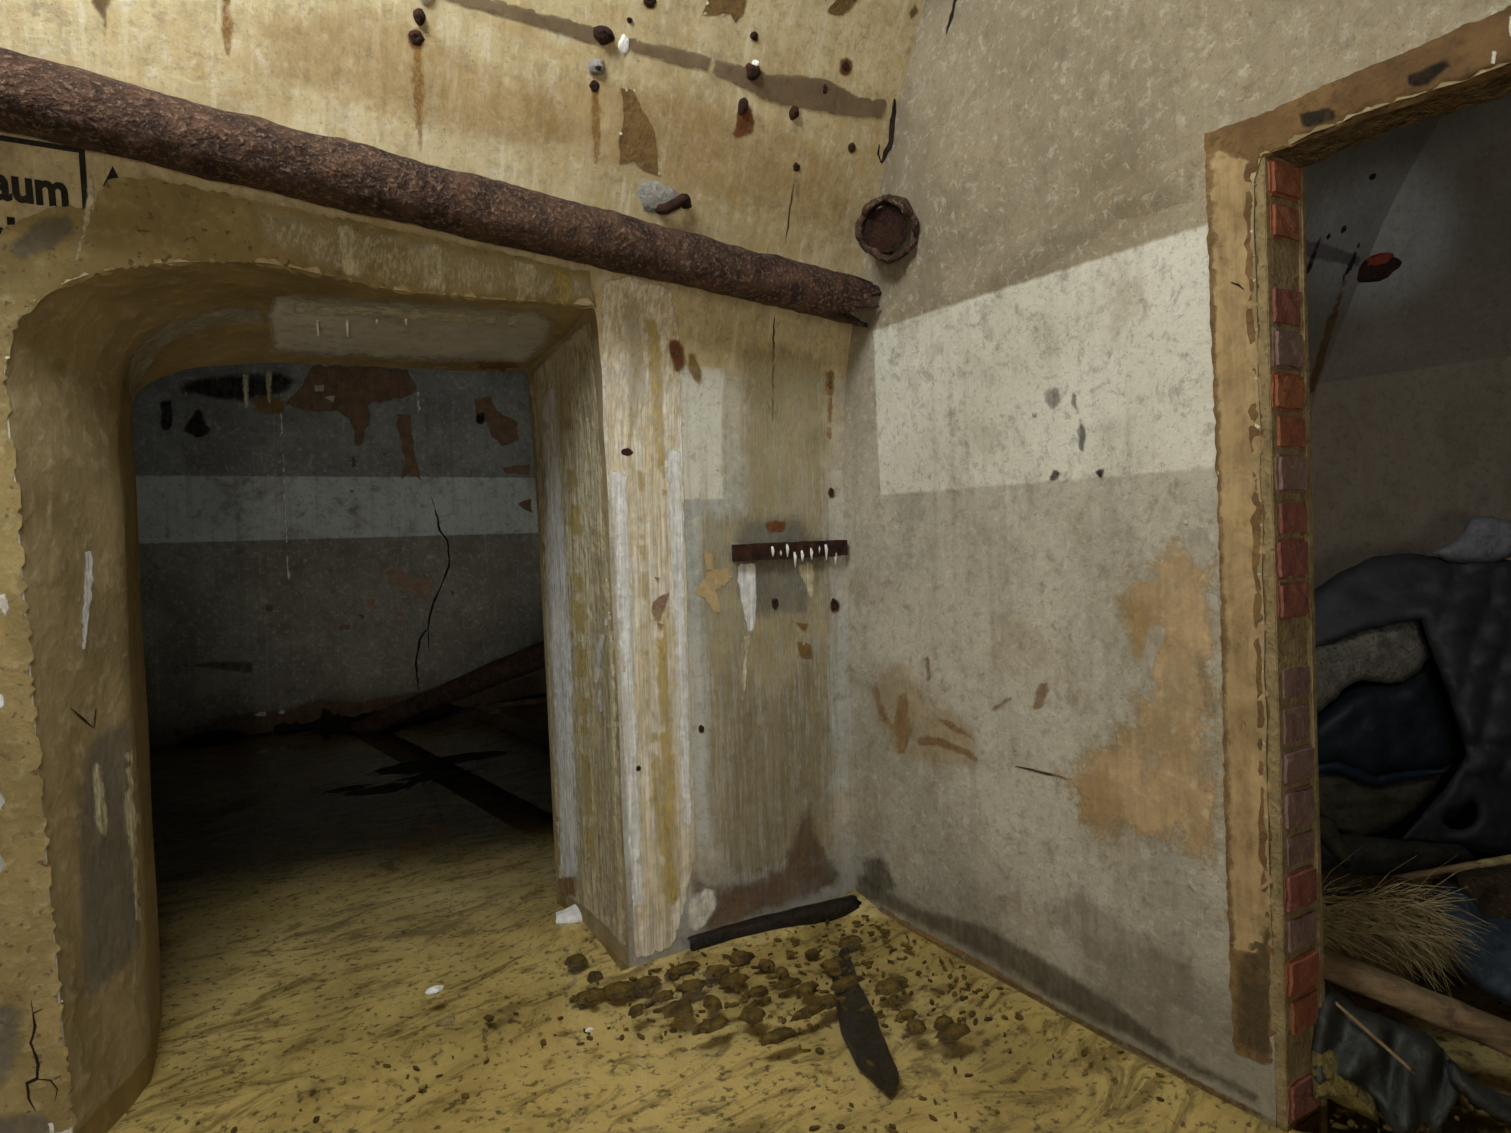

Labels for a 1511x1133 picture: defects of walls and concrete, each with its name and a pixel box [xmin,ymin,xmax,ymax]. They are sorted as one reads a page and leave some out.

rust [222,0,232,54]
peeling [703,0,746,22]
peeling [825,0,857,15]
crack [946,0,957,35]
rust [408,29,423,132]
peeling [618,88,660,175]
spalling [1055,5,1511,1063]
crack [415,497,450,690]
peeling [0,177,597,1133]